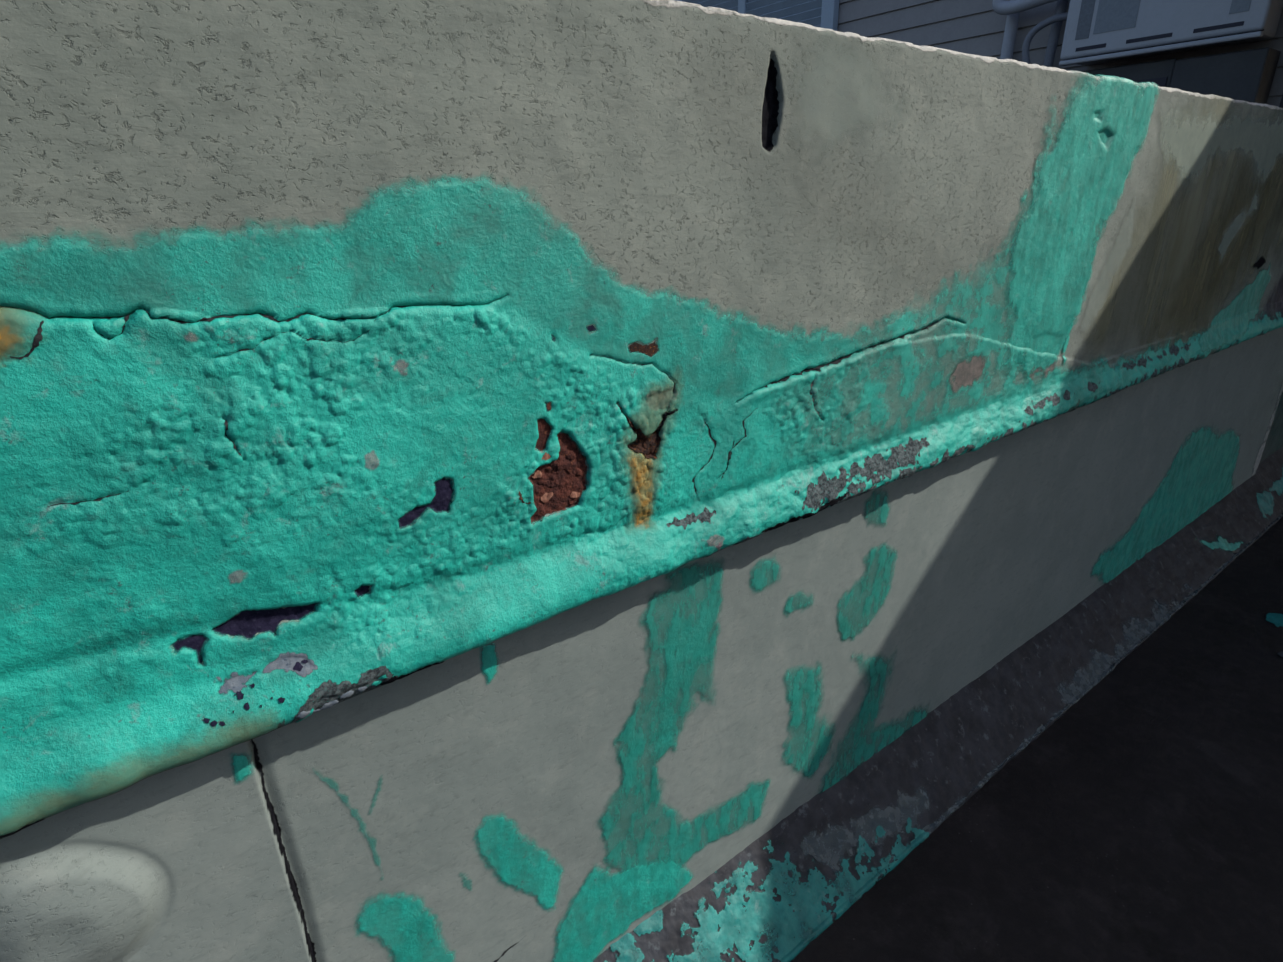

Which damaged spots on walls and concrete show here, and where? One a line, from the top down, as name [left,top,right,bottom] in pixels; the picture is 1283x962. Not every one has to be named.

crack [762,58,780,152]
damp [1134,101,1283,345]
crack [52,306,408,355]
damp [1089,249,1126,345]
peeling [398,478,454,528]
rust [617,402,678,525]
crack [667,317,944,529]
peeling [795,339,1232,512]
peeling [173,603,318,664]
peeling [204,652,398,730]